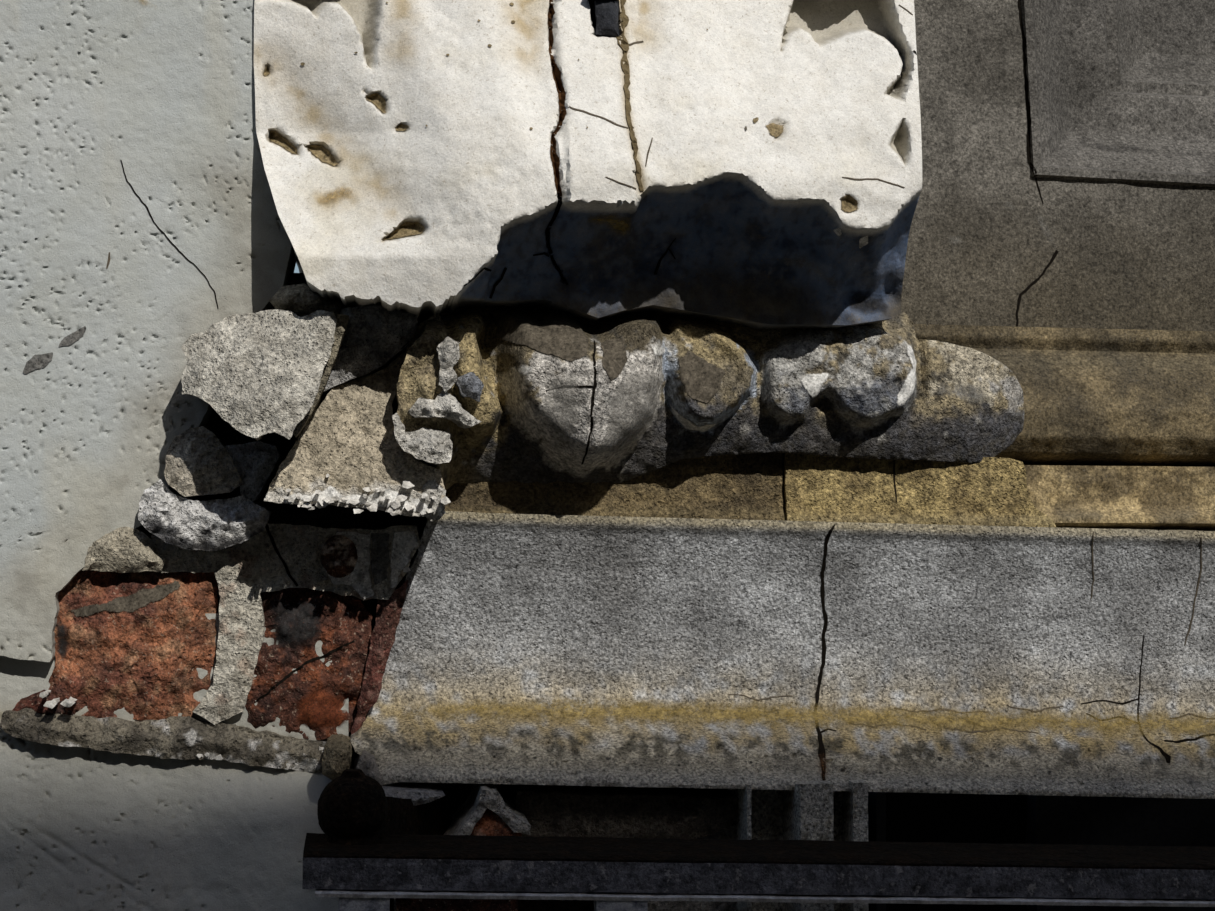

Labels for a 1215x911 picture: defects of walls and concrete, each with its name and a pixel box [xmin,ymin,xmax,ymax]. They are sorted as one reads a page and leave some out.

spalling [588,0,619,37]
peeling [366,93,386,113]
crack [1018,0,1044,204]
peeling [269,131,339,166]
crack [533,0,653,285]
crack [121,160,219,309]
peeling [380,222,424,241]
peeling [841,194,858,212]
crack [1016,250,1059,327]
peeling [23,326,86,374]
crack [546,341,597,465]
crack [728,524,1215,781]